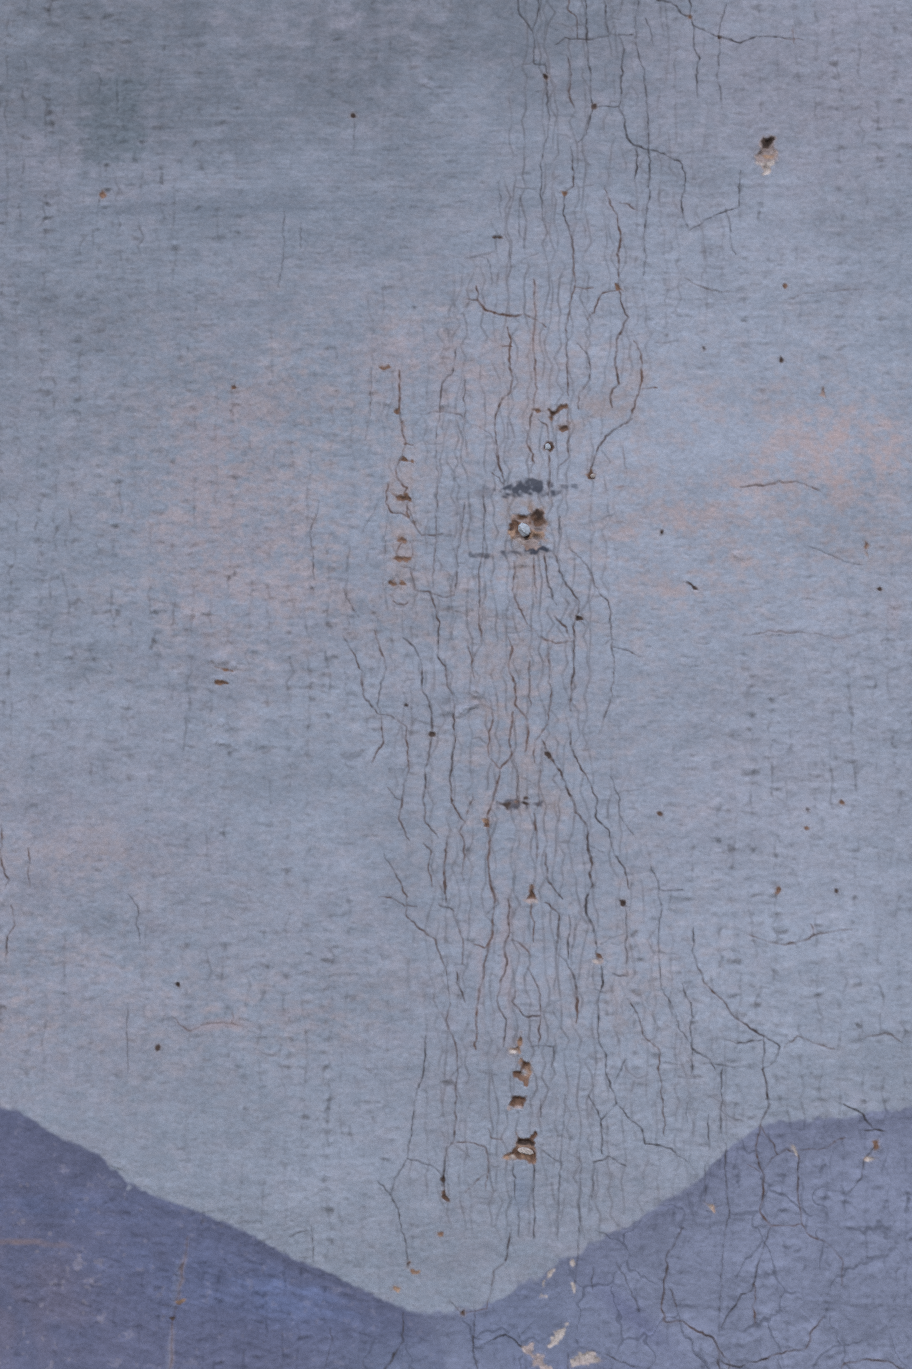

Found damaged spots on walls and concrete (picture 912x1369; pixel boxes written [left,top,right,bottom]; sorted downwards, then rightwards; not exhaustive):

hole [752,133,783,177]
crack [277,210,303,288]
hole [505,505,548,542]
crack [308,0,905,1369]
hole [498,1028,542,1167]
crack [288,1225,316,1264]
crack [166,1234,191,1369]
peeling [519,1318,609,1369]